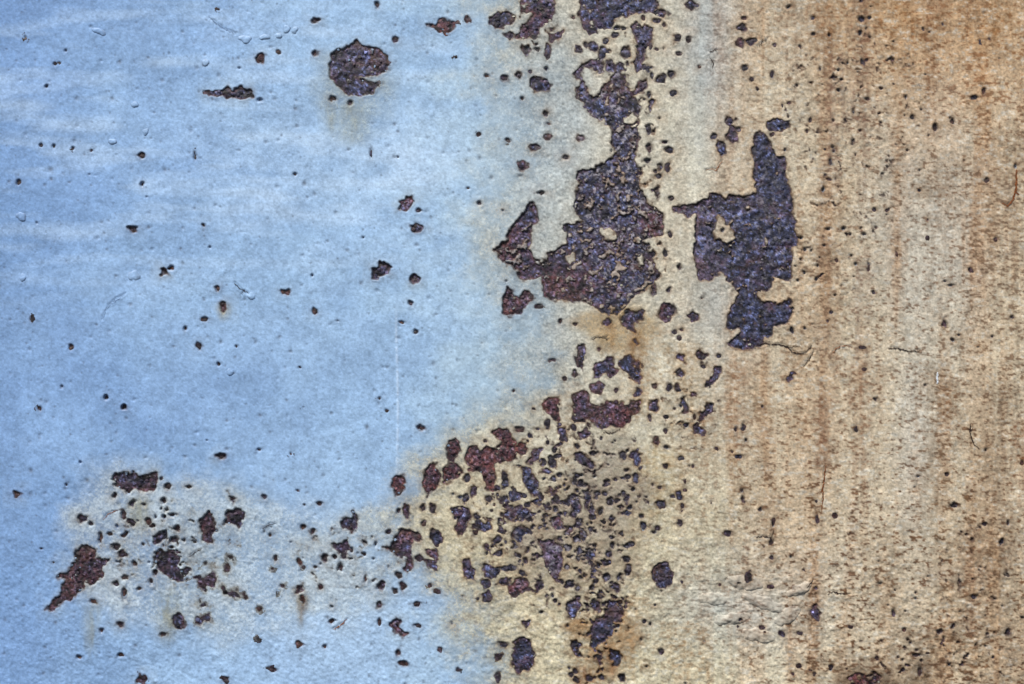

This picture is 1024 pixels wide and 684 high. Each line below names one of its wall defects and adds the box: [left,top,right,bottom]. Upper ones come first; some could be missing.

peeling [488,0,798,350]
corrosion [357,0,1024,684]
corrosion [64,477,407,635]